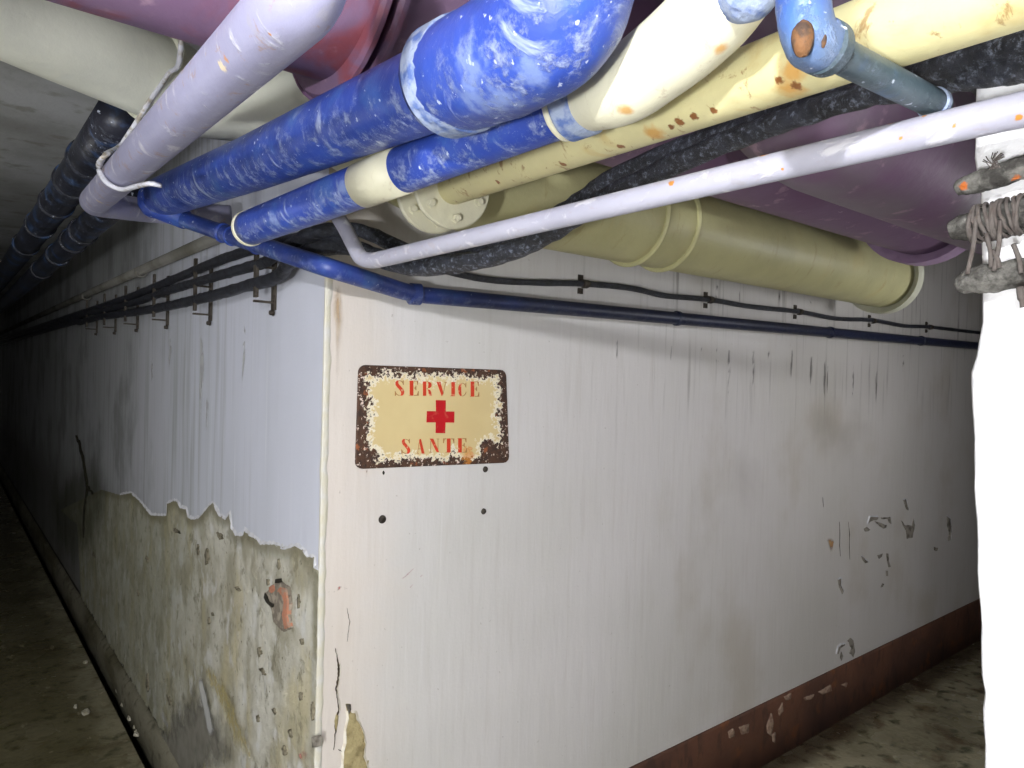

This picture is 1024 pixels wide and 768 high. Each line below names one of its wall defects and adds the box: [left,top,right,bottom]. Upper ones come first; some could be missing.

crack [75,435,94,538]
flaking render [61,277,333,768]
spalling [864,498,915,539]
spalling [836,638,855,661]
crack [333,609,350,752]
peeling [804,682,847,700]
flaking render [340,704,369,768]
peeling [728,724,749,738]
peeling [766,693,791,743]